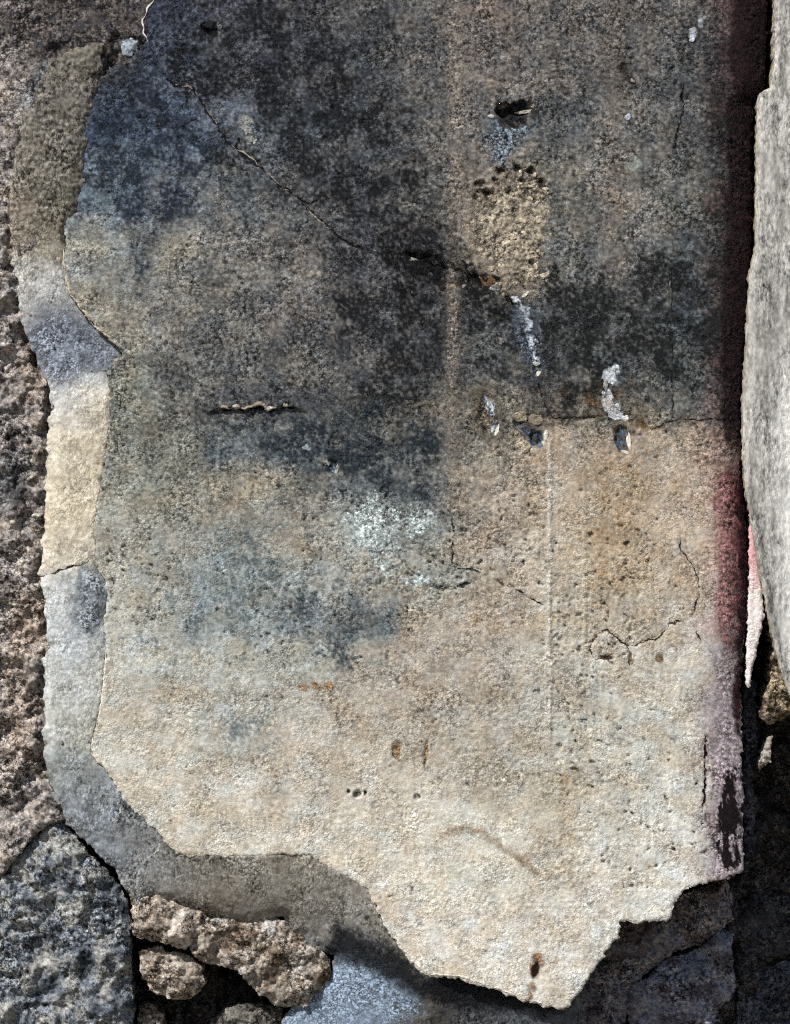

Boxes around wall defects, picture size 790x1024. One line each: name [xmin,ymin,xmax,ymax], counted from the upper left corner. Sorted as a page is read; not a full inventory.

crack [156,66,377,256]
water stain [77,0,745,589]
spalling [462,164,552,377]
crack [209,401,301,413]
water stain [543,443,552,774]
crack [589,538,701,666]